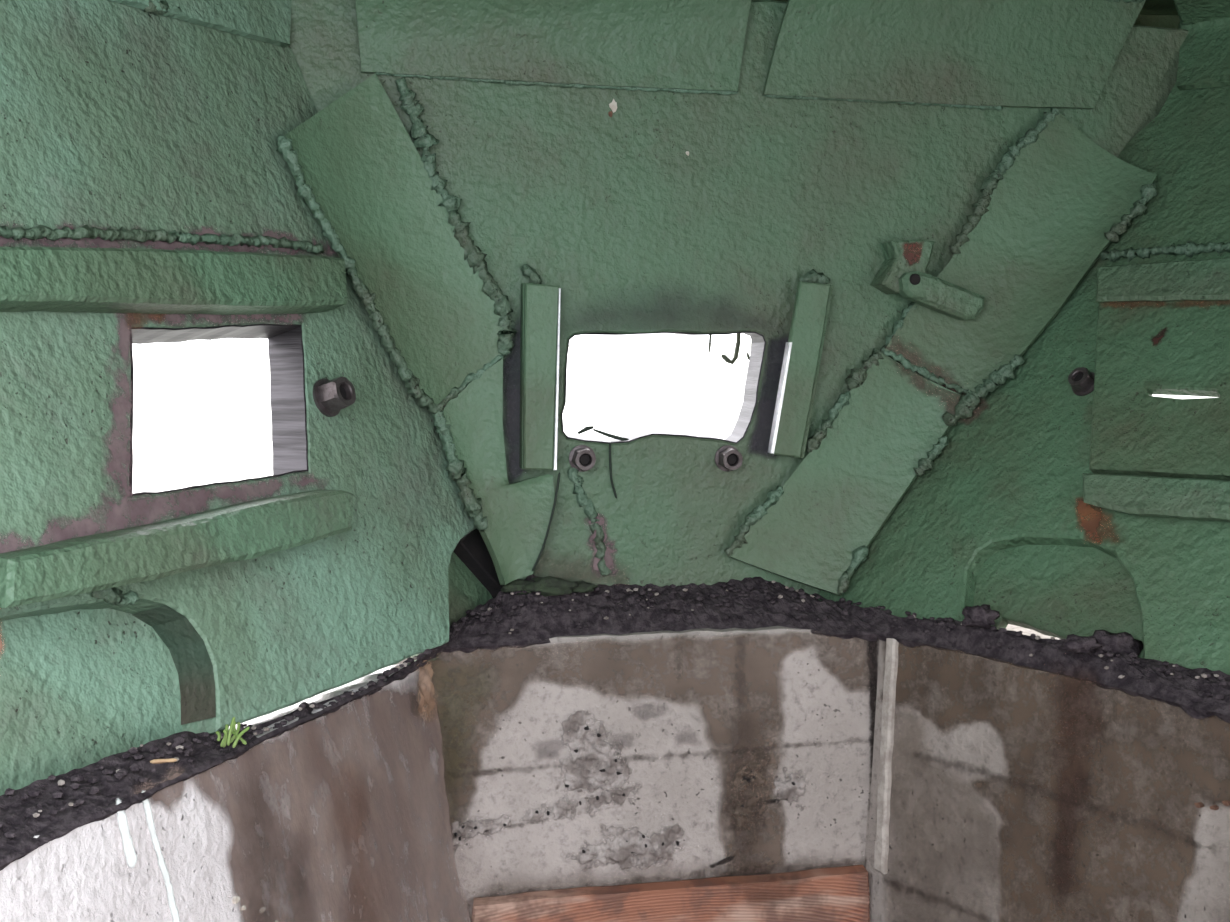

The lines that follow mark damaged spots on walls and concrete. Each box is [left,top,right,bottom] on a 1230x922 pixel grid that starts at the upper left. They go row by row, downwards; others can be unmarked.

rust [903,243,922,266]
rust [1076,498,1116,544]
spalling [452,711,684,871]
water stain [137,633,1230,922]